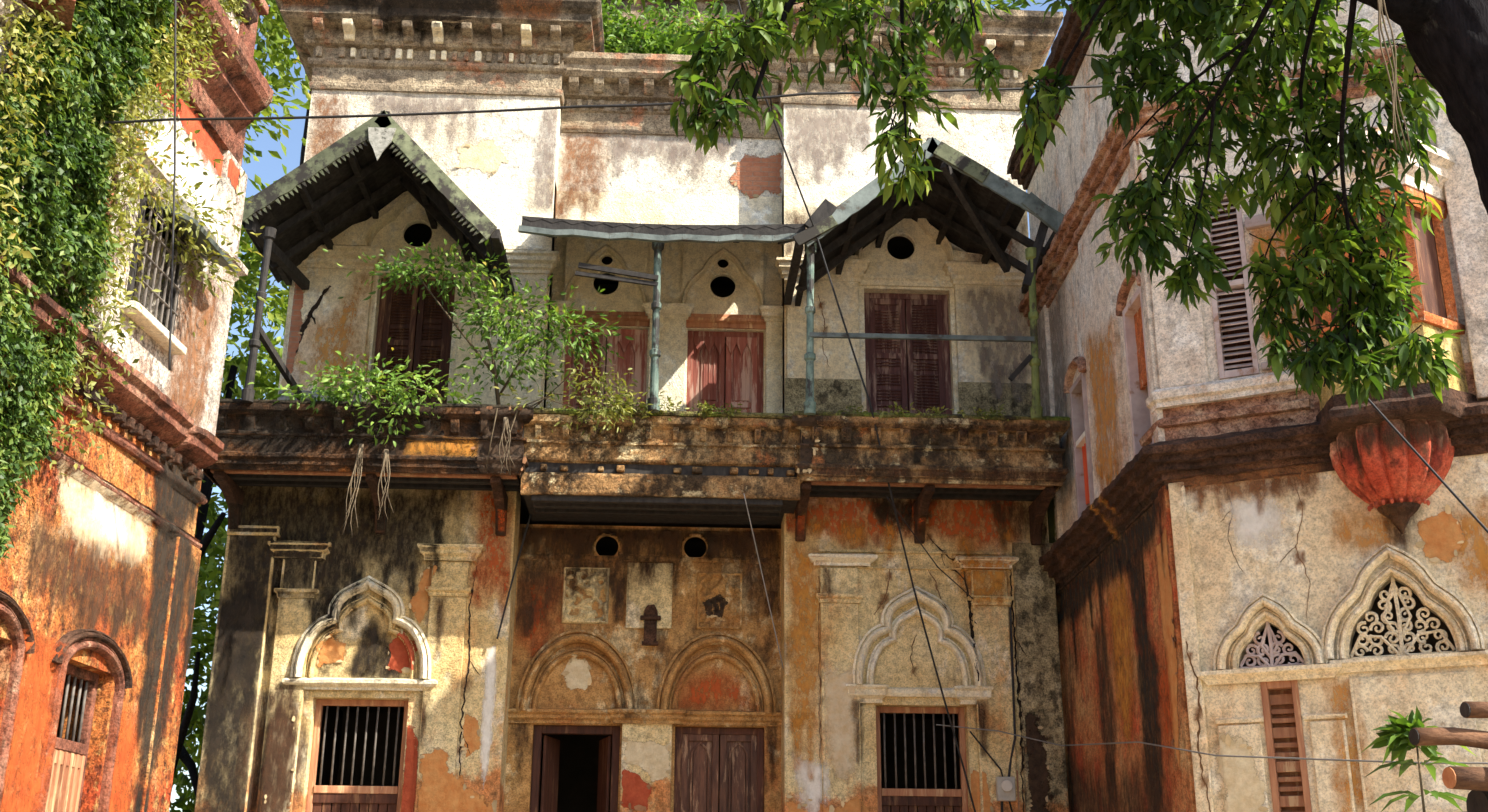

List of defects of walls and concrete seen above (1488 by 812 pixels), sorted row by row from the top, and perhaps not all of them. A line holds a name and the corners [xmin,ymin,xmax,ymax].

flaking render [729,153,786,199]
crack [295,286,331,356]
water stain [29,273,464,812]
crack [1222,482,1243,571]
water stain [1180,464,1319,542]
crack [1280,486,1310,616]
flaking render [1415,504,1466,563]
peeling [316,634,346,667]
water stain [1055,489,1169,812]
flaking render [619,738,672,812]